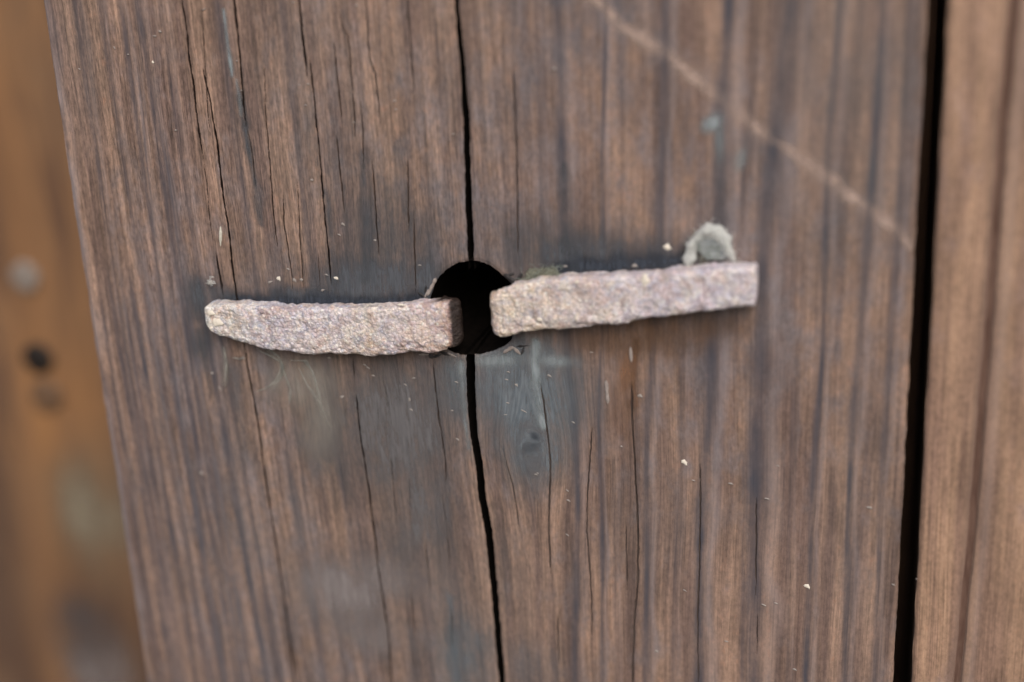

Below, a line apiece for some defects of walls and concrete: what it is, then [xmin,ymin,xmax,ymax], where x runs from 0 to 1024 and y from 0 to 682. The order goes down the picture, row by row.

crack [182,0,239,301]
crack [455,0,481,269]
crack [344,361,411,682]
crack [466,323,519,682]
crack [541,387,551,572]
crack [585,432,593,629]
crack [625,384,639,682]